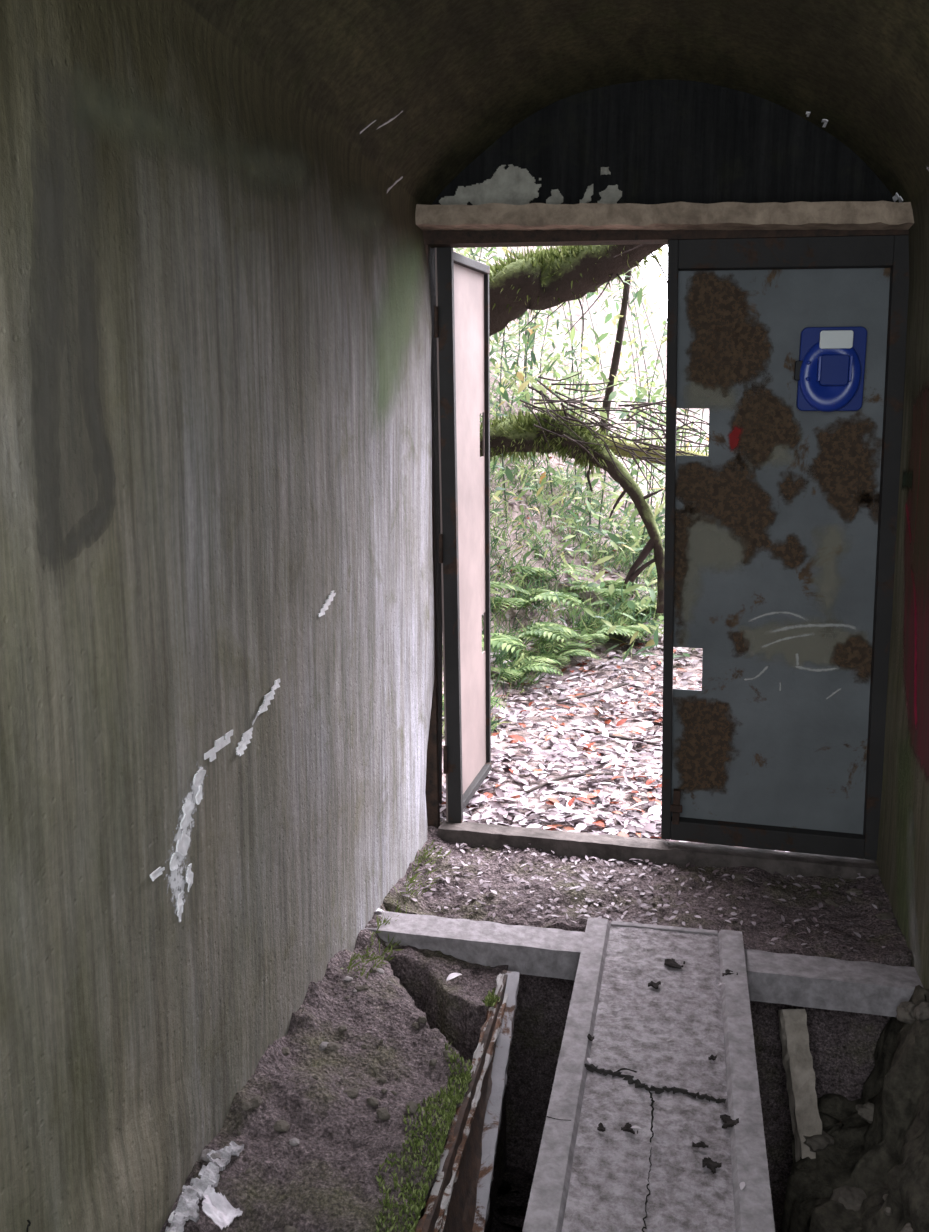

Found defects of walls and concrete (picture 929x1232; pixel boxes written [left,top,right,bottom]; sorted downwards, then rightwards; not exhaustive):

peeling [318,590,336,617]
peeling [149,679,280,922]
crack [584,1063,726,1232]